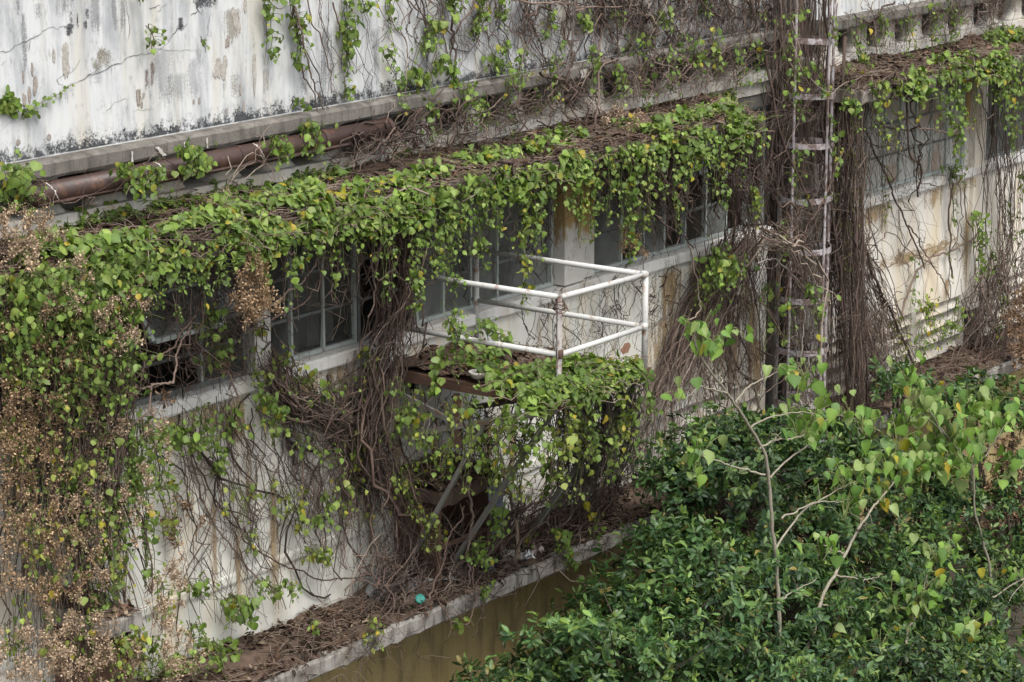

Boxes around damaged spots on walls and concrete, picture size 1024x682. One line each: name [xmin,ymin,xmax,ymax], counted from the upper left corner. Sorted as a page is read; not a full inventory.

crack [58,3,211,88]
peeling [136,63,155,109]
peeling [213,0,247,81]
damp [227,12,239,43]
damp [0,21,769,167]
damp [880,237,958,270]